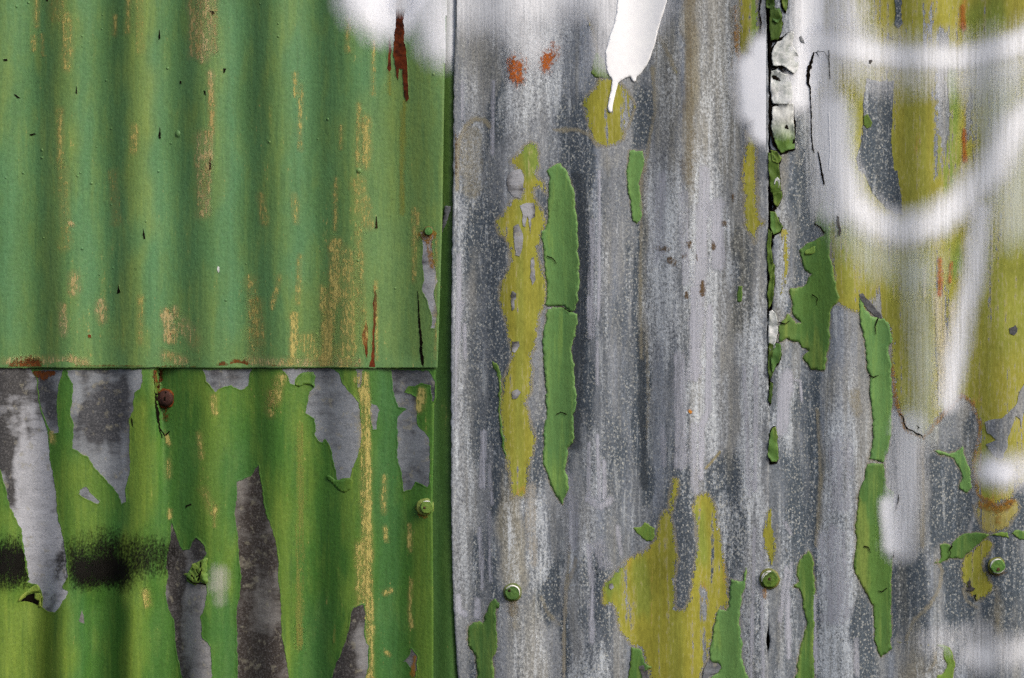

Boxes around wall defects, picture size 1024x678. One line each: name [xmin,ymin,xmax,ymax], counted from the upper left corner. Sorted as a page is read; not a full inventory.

rust [386,10,410,102]
rust [507,52,527,84]
rust [540,43,558,71]
crack [758,0,831,185]
crack [767,187,775,317]
peeling [766,0,841,405]
rust [361,284,378,368]
crack [416,291,424,367]
peeling [0,368,145,615]
peeling [854,293,894,658]
peeling [232,463,291,678]
crack [764,627,772,653]